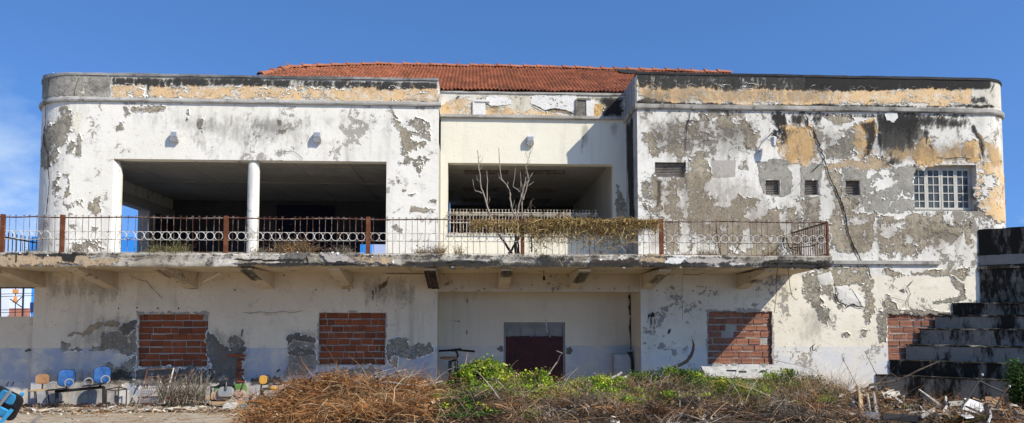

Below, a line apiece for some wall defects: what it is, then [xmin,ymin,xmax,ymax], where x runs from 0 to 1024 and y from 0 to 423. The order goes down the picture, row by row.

spalling [0,105,120,267]
peeling [107,76,576,214]
spalling [573,69,1006,343]
damp [588,74,995,219]
crack [805,114,913,308]
spalling [61,318,248,390]
spalling [282,331,435,381]